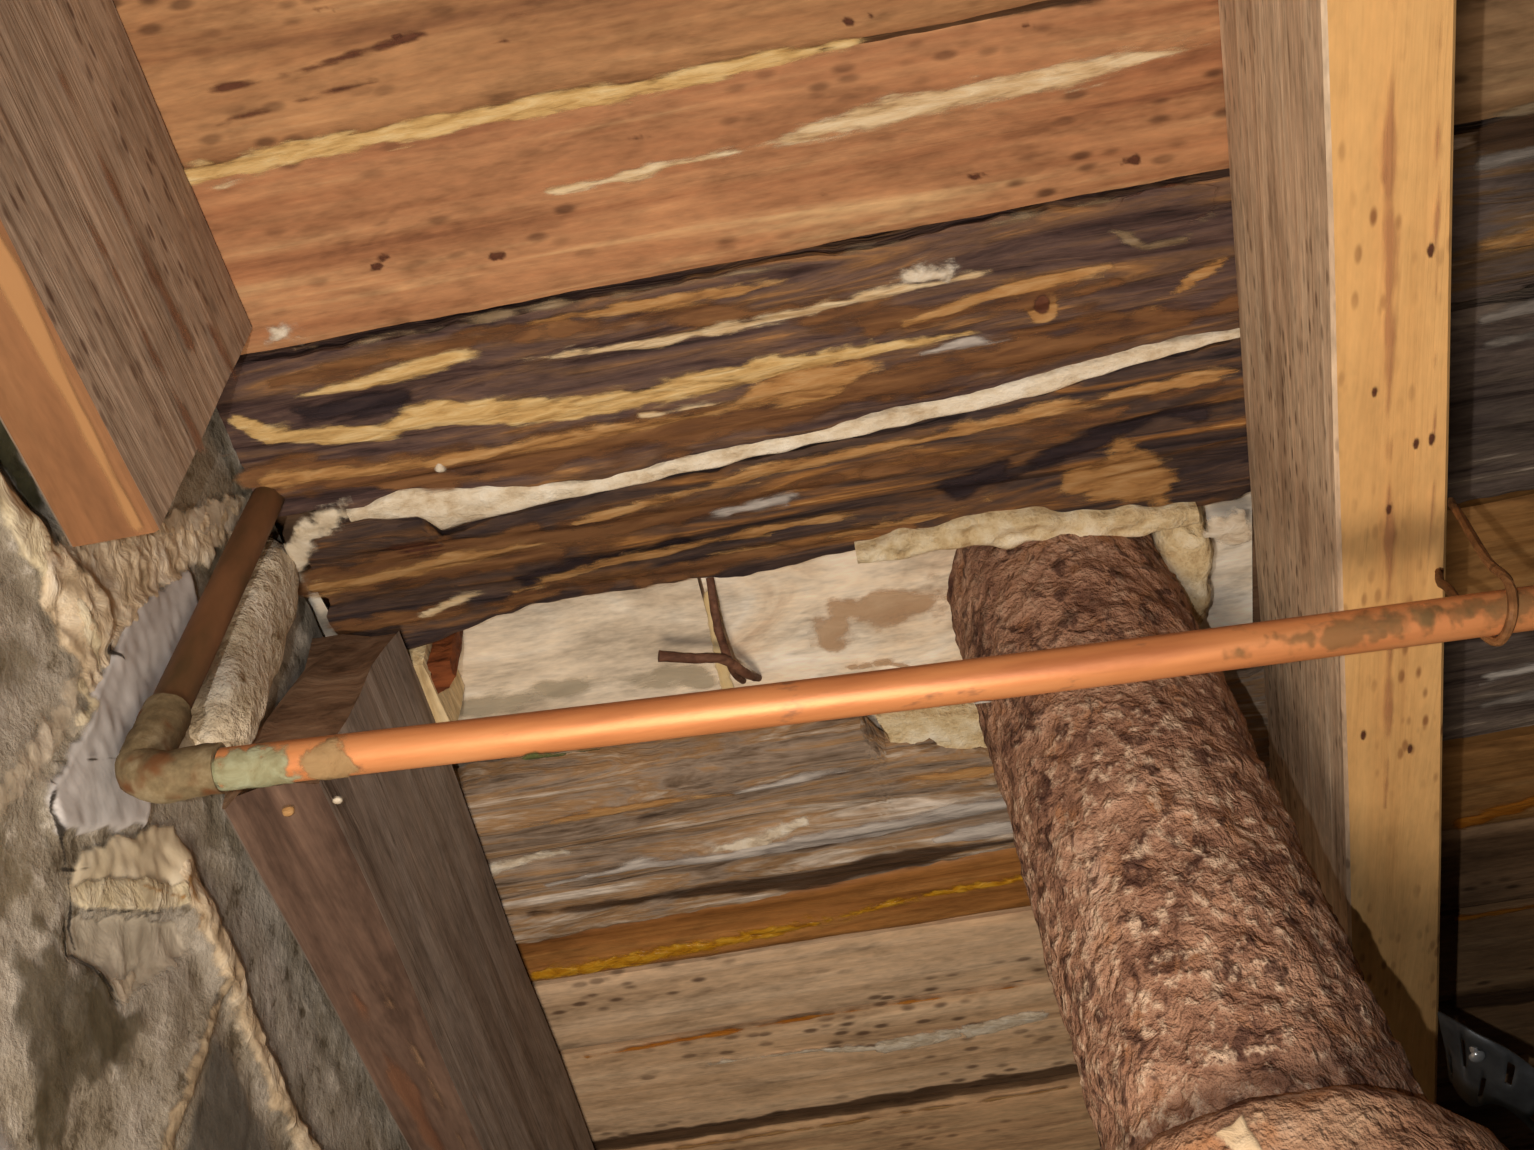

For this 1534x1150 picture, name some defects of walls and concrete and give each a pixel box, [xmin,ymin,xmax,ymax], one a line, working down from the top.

water stain [18,947,141,1150]